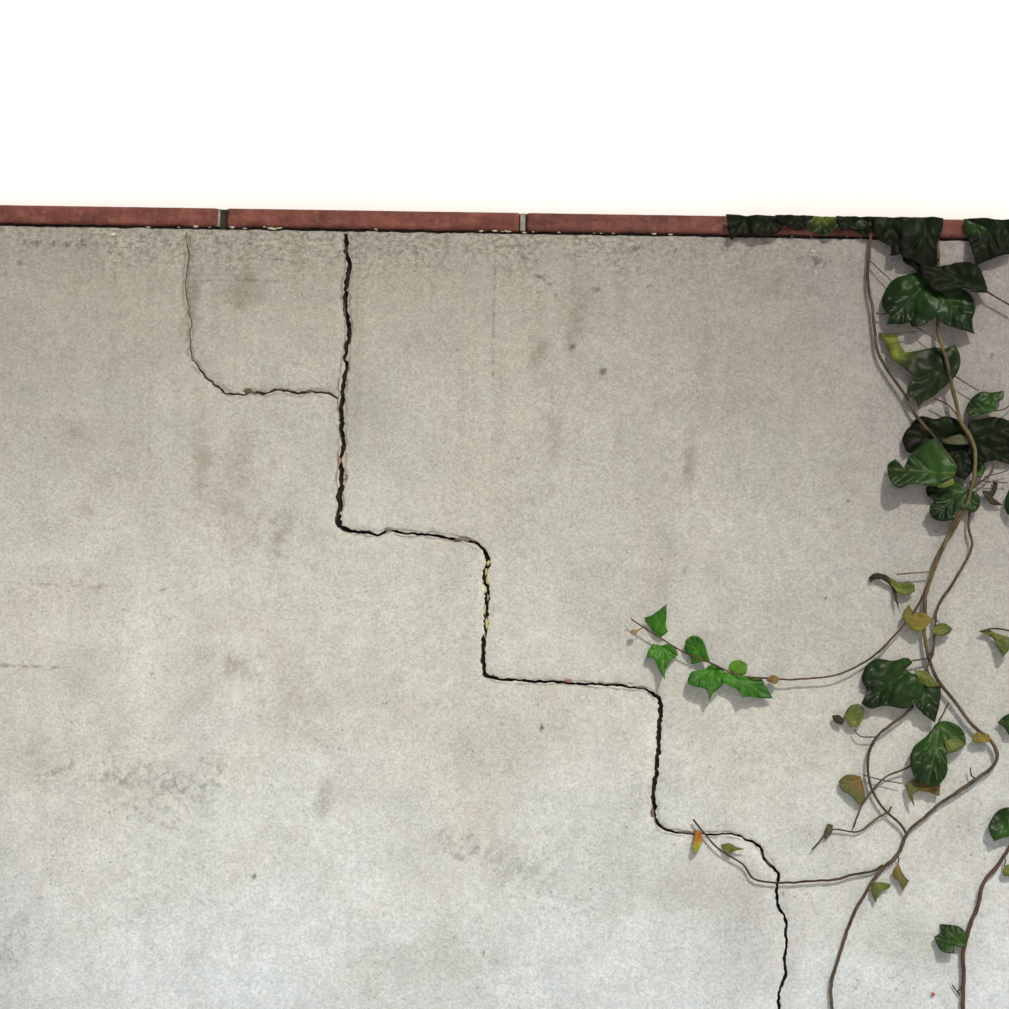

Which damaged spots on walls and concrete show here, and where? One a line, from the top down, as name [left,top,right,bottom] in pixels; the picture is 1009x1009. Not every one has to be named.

crack [185,232,788,1009]